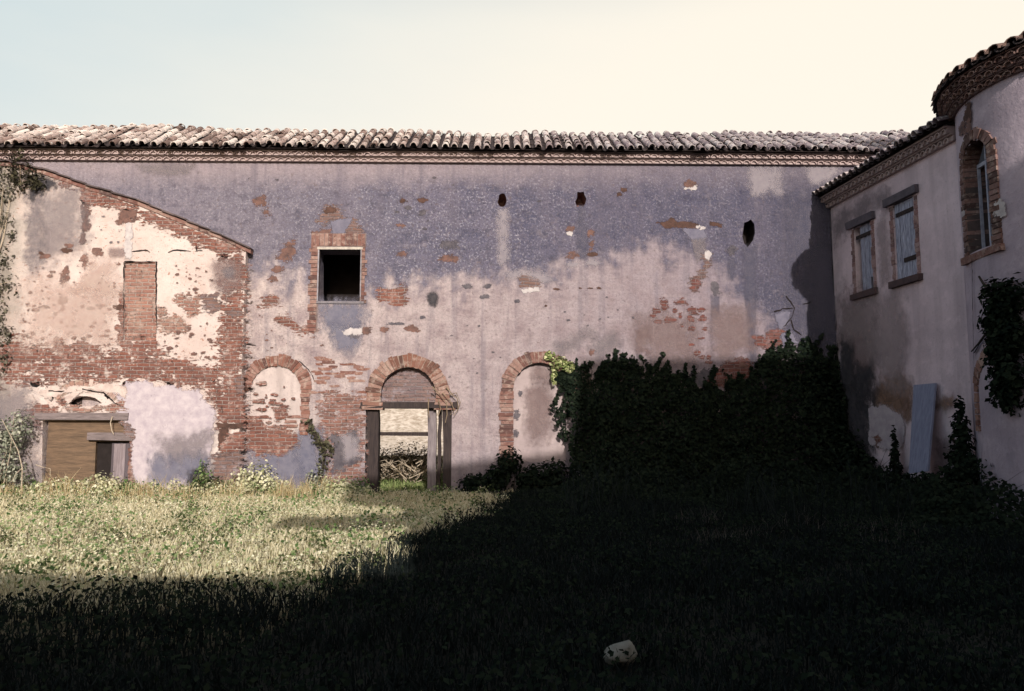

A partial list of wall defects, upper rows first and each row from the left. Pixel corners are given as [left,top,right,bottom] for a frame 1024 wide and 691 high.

leakage [750,167,781,195]
leakage [809,166,837,182]
leakage [498,210,507,265]
flaking render [0,176,370,490]
leakage [318,299,363,352]
leakage [427,292,438,307]
spalling [650,217,723,387]
flaking render [751,311,799,350]
crack [774,234,839,370]
leakage [788,193,905,458]